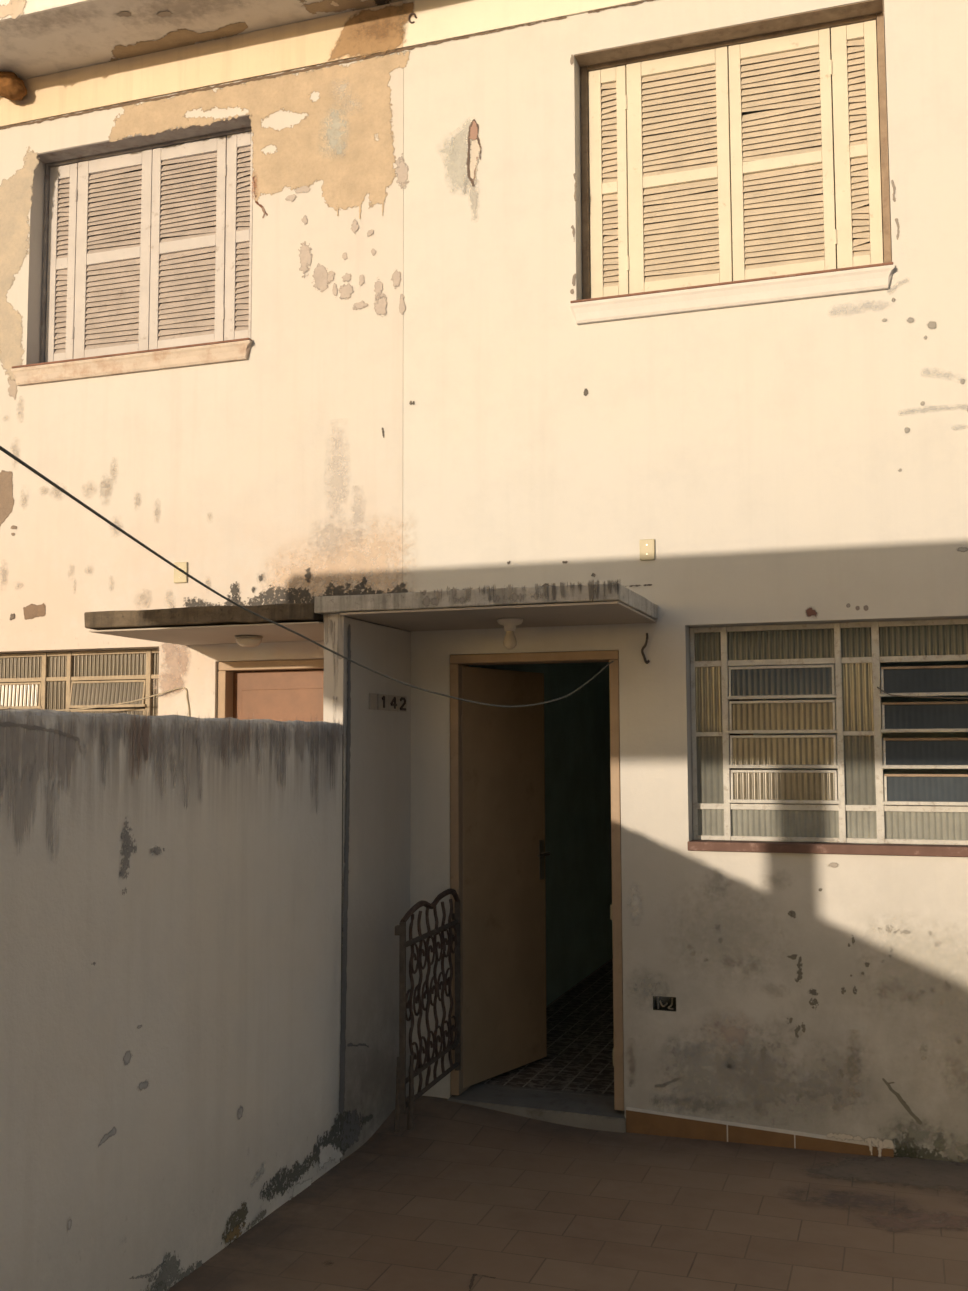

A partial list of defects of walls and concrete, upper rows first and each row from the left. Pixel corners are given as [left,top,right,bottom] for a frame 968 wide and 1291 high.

peeling [109,11,248,62]
water stain [328,0,414,61]
peeling [109,51,410,256]
peeling [0,147,39,399]
peeling [298,241,406,315]
flaking render [0,470,17,536]
flaking render [10,603,46,620]
water stain [0,710,344,847]
water stain [120,818,164,894]
water stain [787,954,819,1008]
flaking render [222,1110,373,1245]
water stain [893,1124,968,1164]